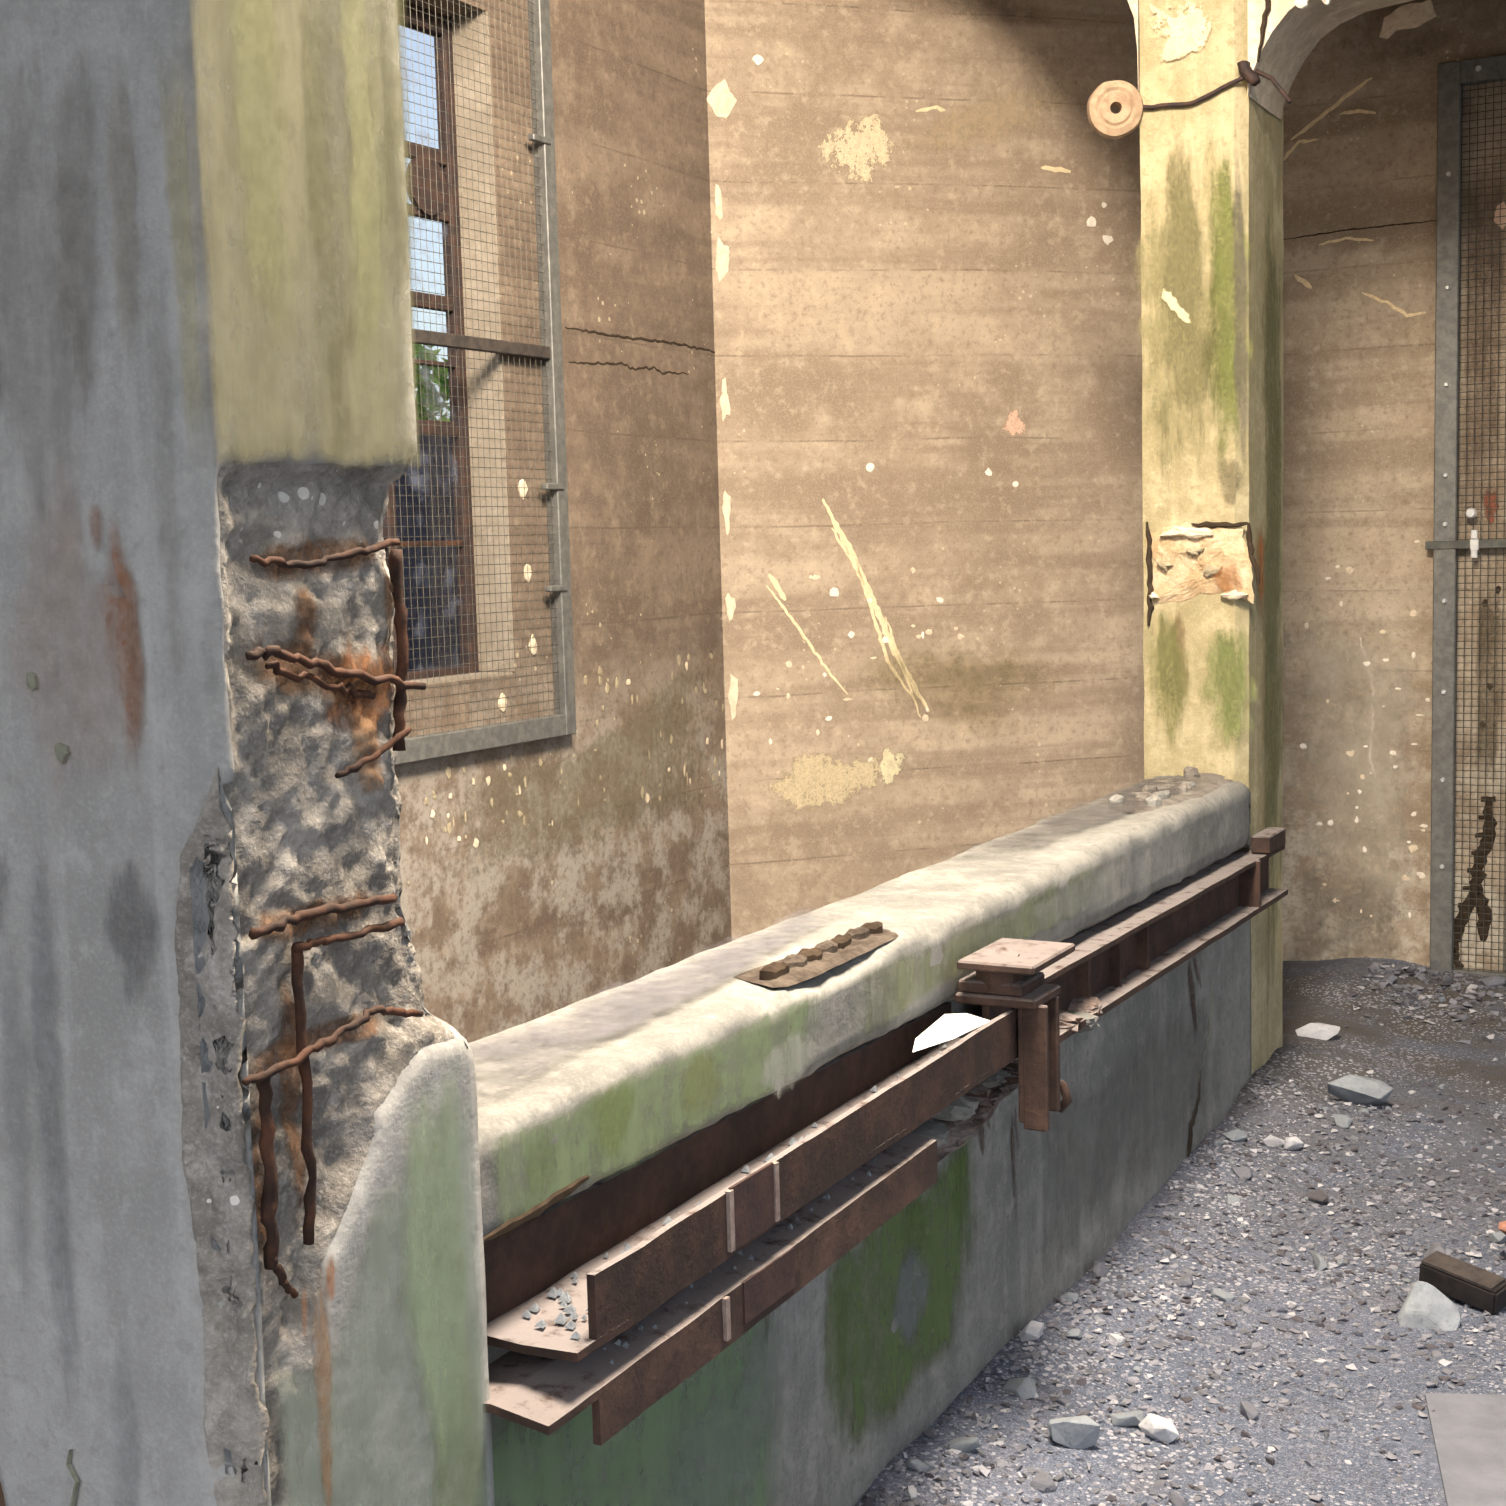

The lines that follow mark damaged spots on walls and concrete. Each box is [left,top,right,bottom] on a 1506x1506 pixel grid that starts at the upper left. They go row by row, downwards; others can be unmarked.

crack [565,327,715,375]
leakage [1162,166,1247,428]
leakage [1221,460,1239,501]
rust [93,514,139,727]
spalling [1145,521,1260,682]
rust [328,643,393,791]
crack [1454,796,1498,969]
spalling [175,457,468,1506]
spalling [911,1066,1018,1163]
spalling [1059,996,1103,1033]
crack [1188,979,1213,1157]
rust [302,1261,334,1506]